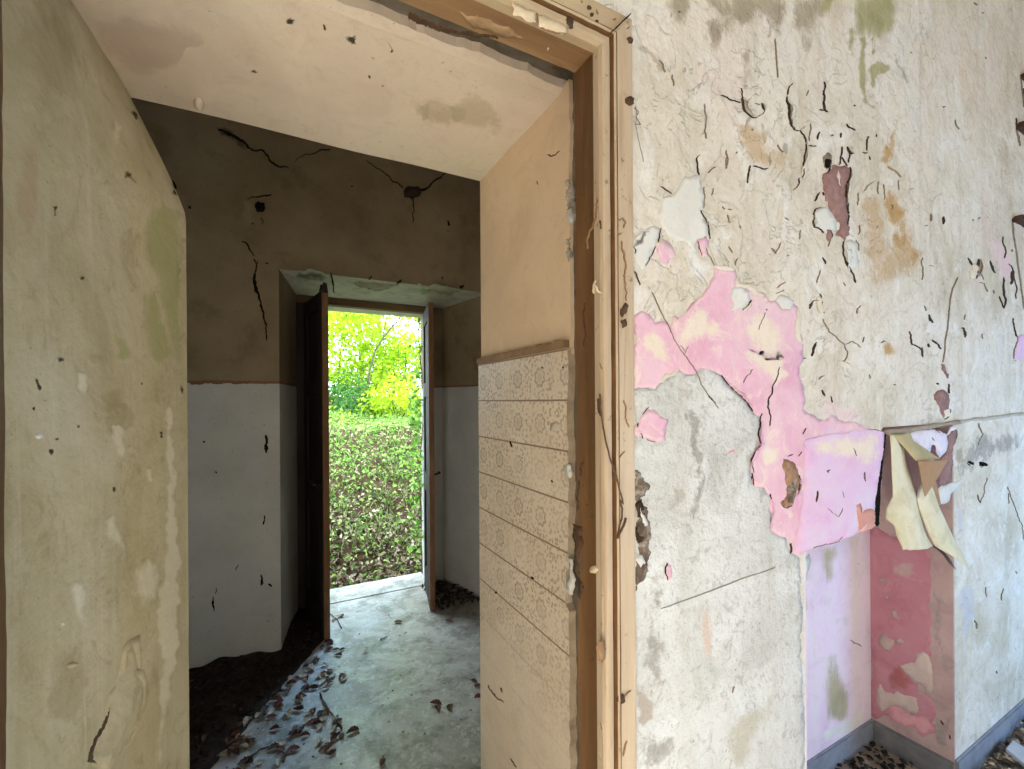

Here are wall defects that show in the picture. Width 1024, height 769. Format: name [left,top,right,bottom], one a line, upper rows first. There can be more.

peeling [458,2,574,39]
leakage [635,44,675,86]
leakage [660,0,912,118]
leakage [405,88,508,143]
crack [214,125,330,168]
leakage [729,117,791,174]
crack [241,241,267,341]
crack [909,277,983,363]
flaking render [616,165,936,769]